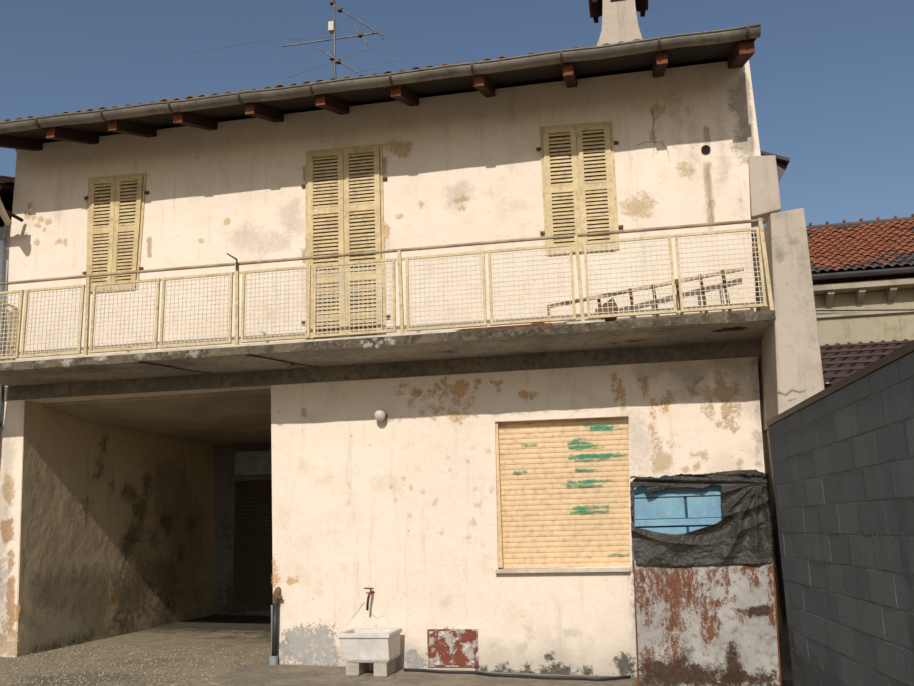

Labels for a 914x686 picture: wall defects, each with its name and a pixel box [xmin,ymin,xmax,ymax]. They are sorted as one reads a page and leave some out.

peeling [687,377,740,432]
spalling [0,518,21,630]
corrosion [630,563,783,686]